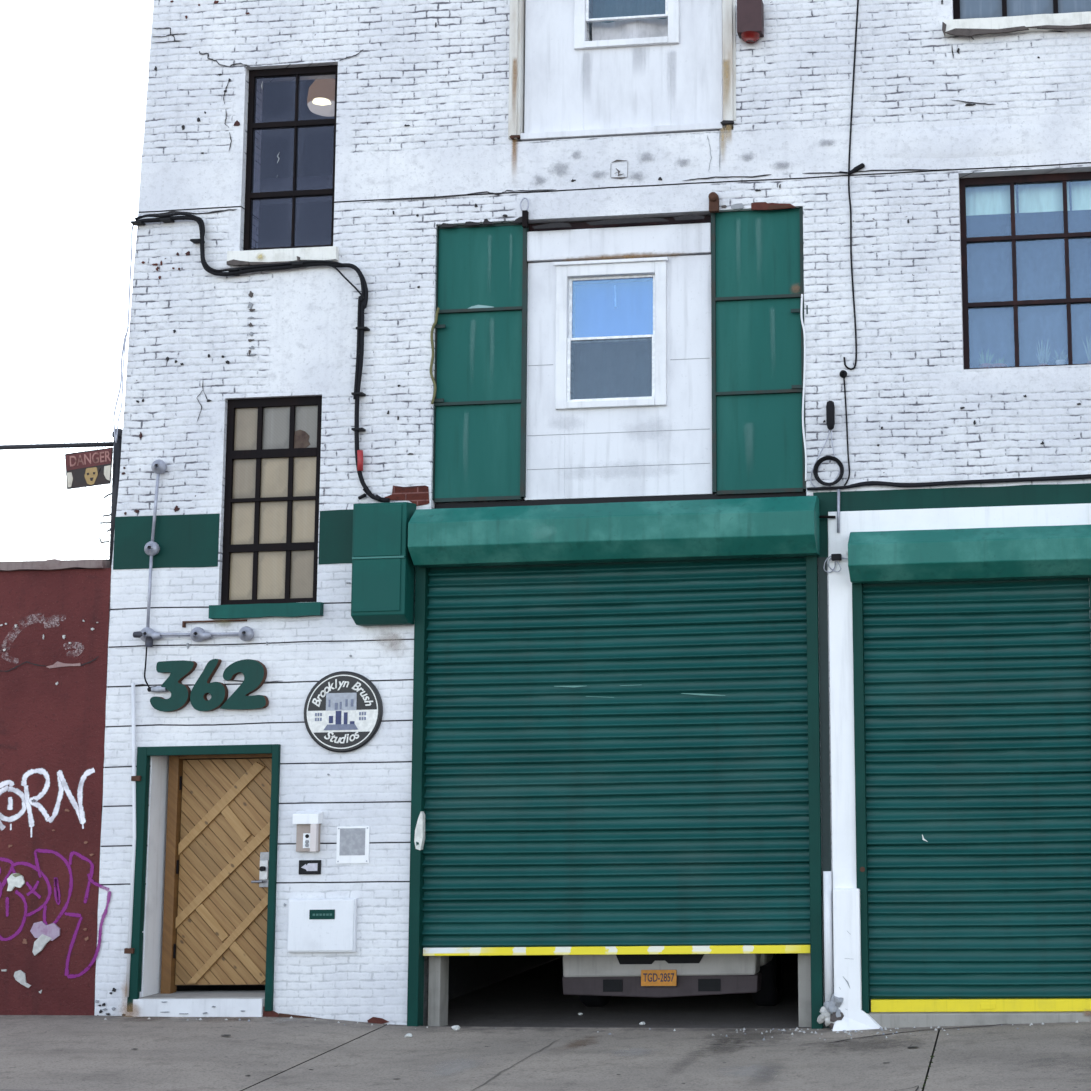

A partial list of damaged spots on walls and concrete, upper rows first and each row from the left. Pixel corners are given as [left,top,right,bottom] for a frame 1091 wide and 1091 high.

flaking render [385,485,430,506]
crack [472,1040,557,1091]